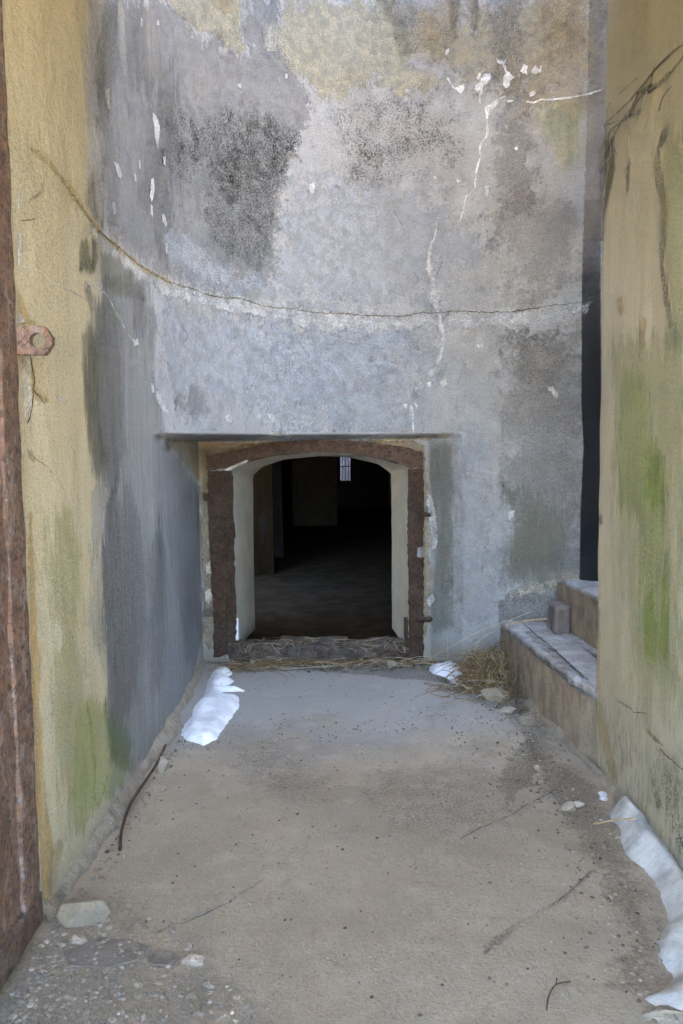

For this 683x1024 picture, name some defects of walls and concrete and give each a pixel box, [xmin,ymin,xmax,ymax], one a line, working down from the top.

peeling [263,0,542,100]
leakage [407,0,605,120]
peeling [153,113,166,166]
peeling [150,178,167,227]
crack [19,148,597,332]
leakage [80,0,494,771]
corrosion [360,434,448,451]
corrosion [29,522,54,898]